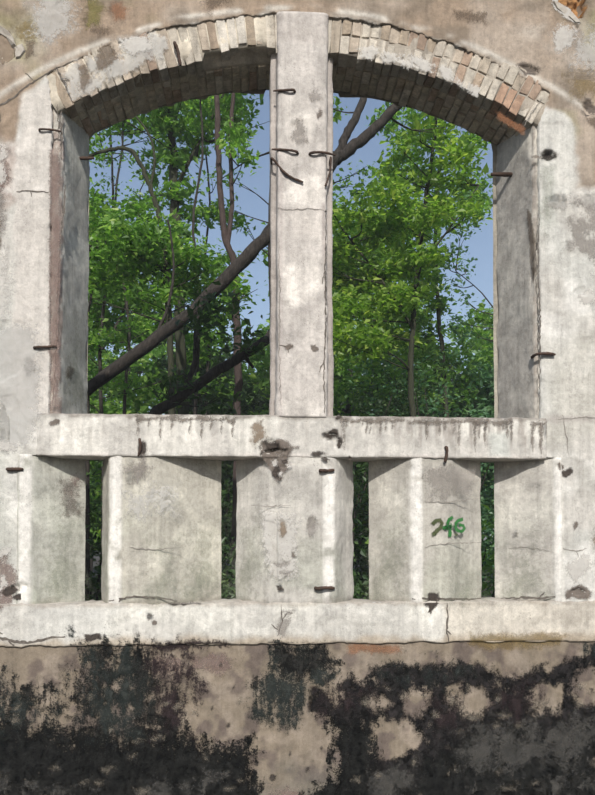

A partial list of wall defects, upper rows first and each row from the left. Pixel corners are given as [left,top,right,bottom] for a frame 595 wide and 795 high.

spalling [551,0,595,70]
peeling [65,34,167,100]
peeling [358,46,480,97]
spalling [519,62,539,75]
water stain [136,414,236,438]
spalling [251,421,300,481]
spalling [0,547,21,609]
crack [0,632,65,648]
crack [412,597,481,642]
crack [501,592,555,600]
peeling [565,554,592,599]
water stain [0,611,595,795]